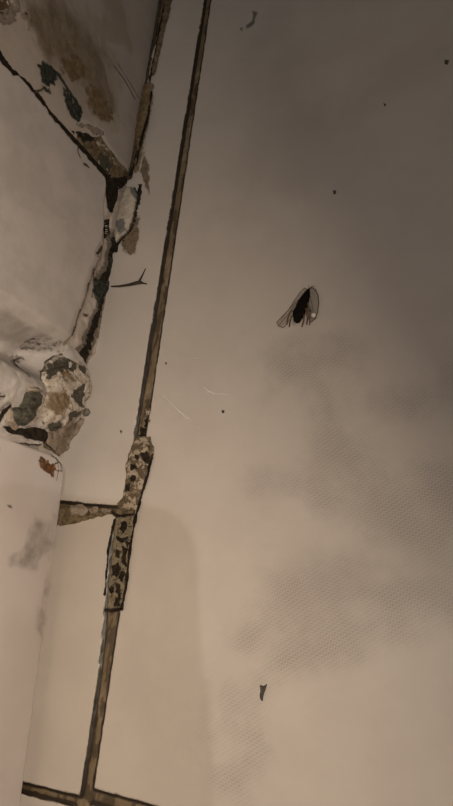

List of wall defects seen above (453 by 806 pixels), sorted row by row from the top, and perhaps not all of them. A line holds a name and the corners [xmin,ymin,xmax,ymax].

crack [0,50,142,364]
water stain [31,0,113,123]
spalling [72,123,128,180]
spalling [5,239,105,451]